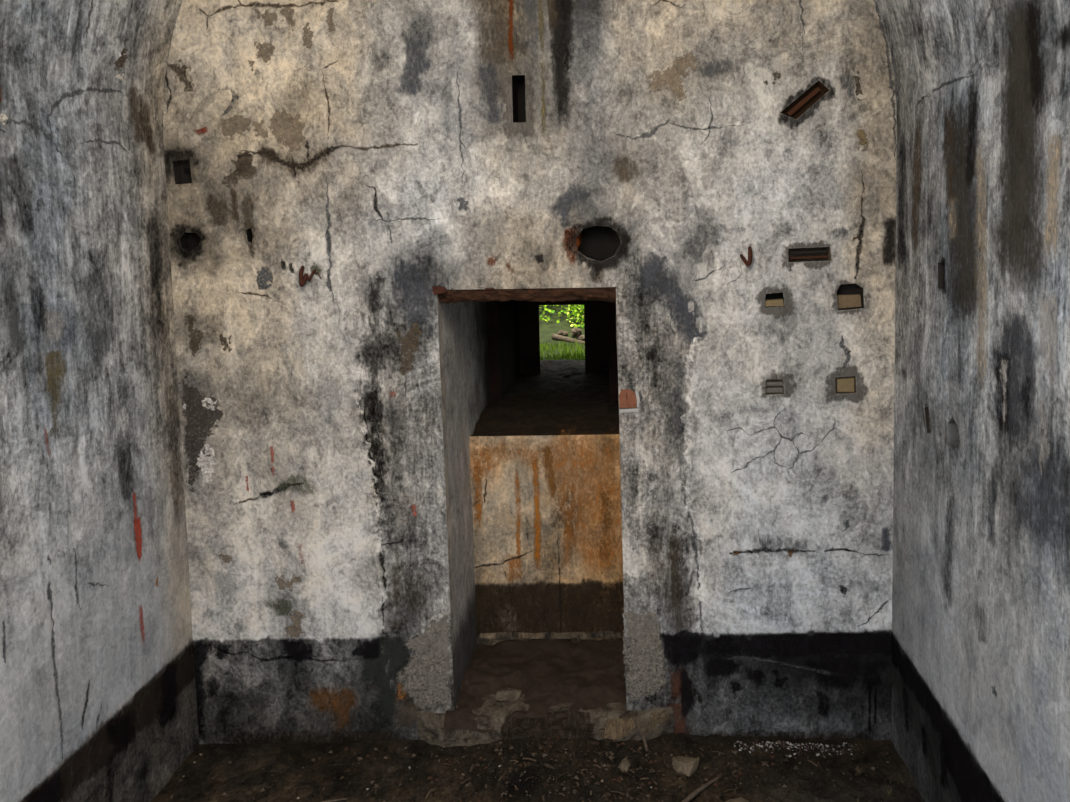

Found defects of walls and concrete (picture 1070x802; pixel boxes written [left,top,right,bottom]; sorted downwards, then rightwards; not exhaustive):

crack [199,0,338,30]
crack [798,0,806,50]
crack [236,61,418,302]
hole [569,218,629,275]
damp [356,264,435,491]
crack [727,410,835,478]
crack [235,477,310,504]
rust [533,438,621,567]
peeling [21,375,388,802]
crack [729,541,888,557]
peeling [659,337,1003,802]